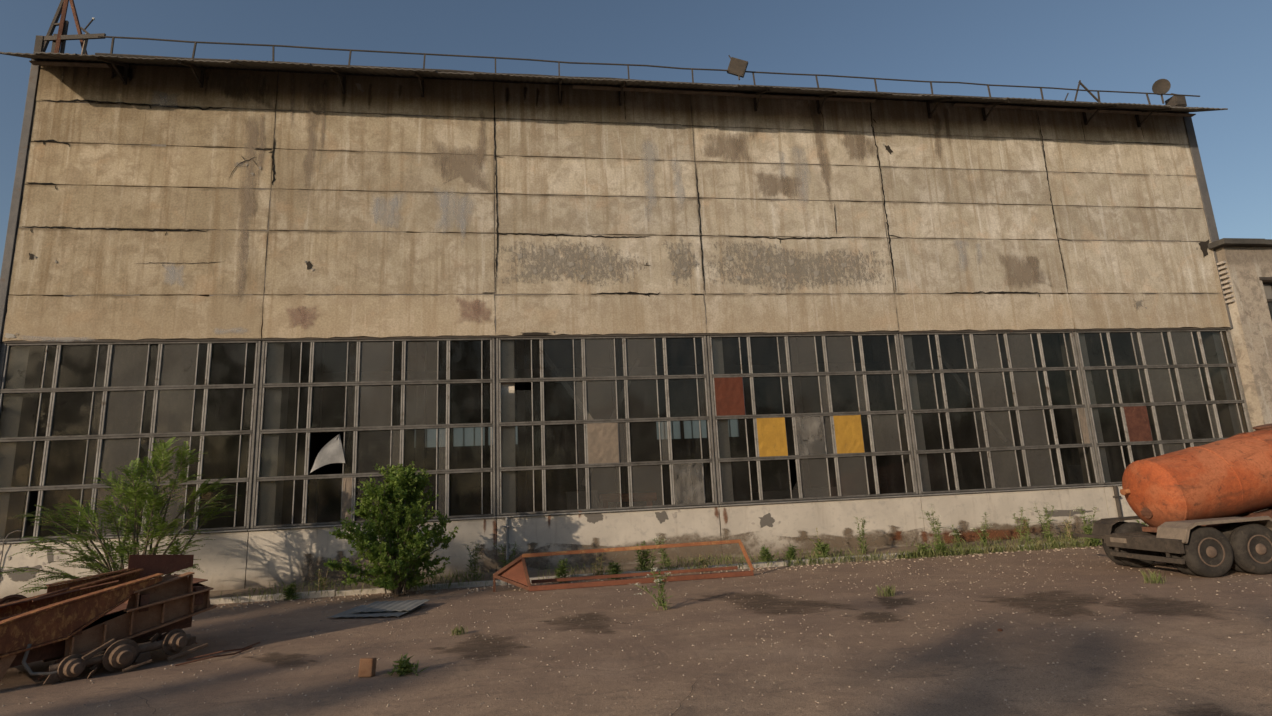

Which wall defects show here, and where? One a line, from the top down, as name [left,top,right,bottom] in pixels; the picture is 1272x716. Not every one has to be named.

crack [47,99,225,110]
leakage [205,69,270,289]
crack [230,138,275,185]
leakage [438,115,485,188]
crack [22,226,216,266]